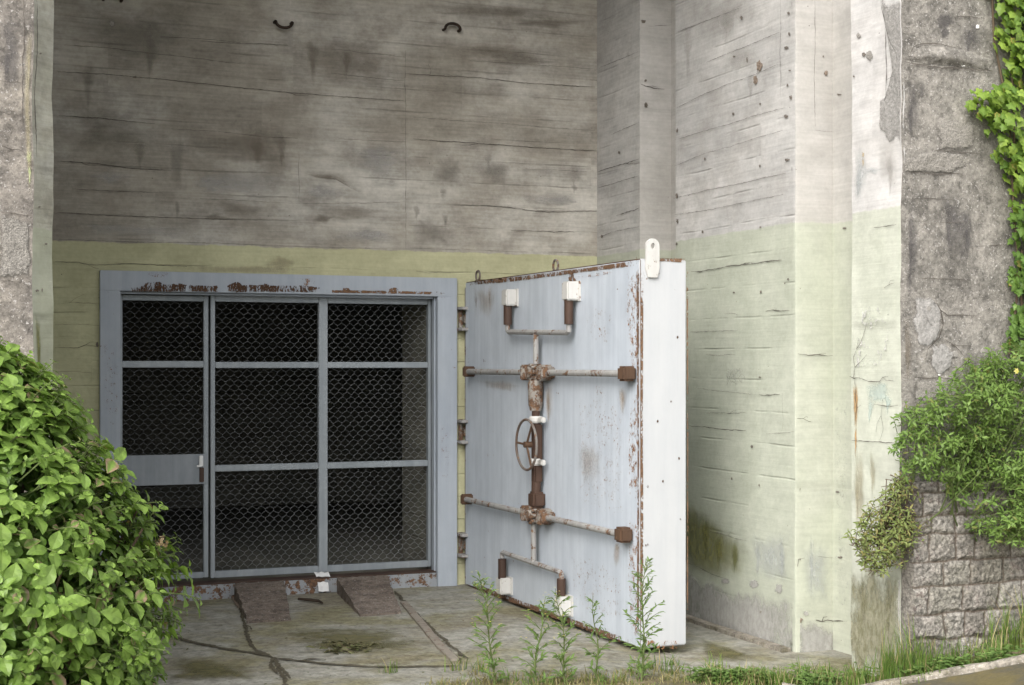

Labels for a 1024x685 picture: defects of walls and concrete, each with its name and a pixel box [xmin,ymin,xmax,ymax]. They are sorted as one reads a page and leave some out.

spalling [879,2,901,141]
rust [132,274,442,294]
rust [470,257,648,633]